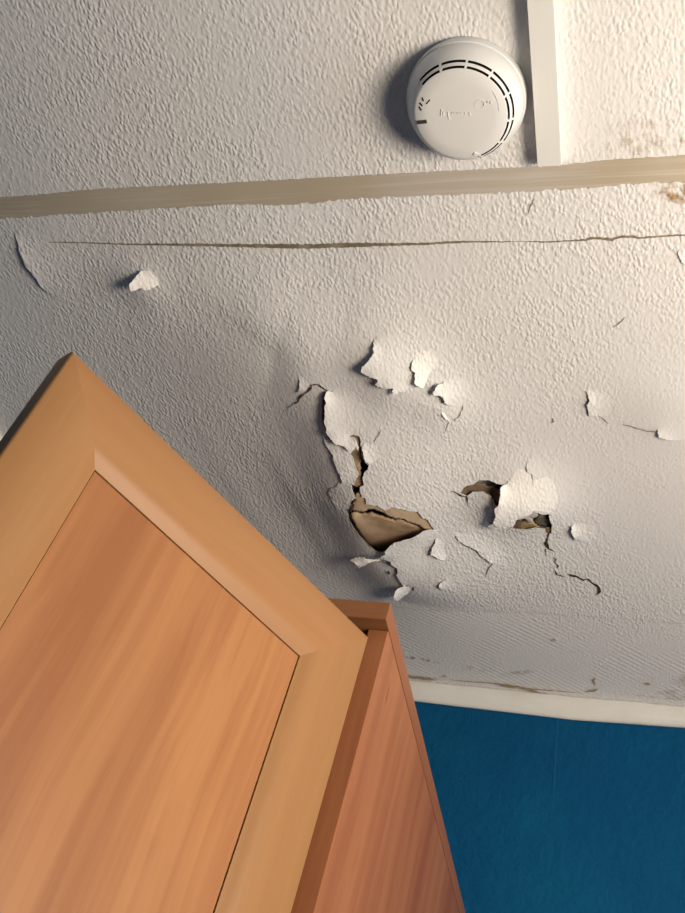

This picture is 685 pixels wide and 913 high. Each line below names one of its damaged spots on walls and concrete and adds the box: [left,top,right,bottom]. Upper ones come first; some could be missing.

peeling [14,229,83,308]
peeling [129,270,158,291]
peeling [297,375,308,393]
peeling [323,388,380,510]
peeling [361,327,469,421]
peeling [586,389,612,417]
peeling [623,404,685,441]
peeling [453,454,558,577]
peeling [571,523,597,542]
peeling [349,529,446,601]
crack [544,534,601,596]